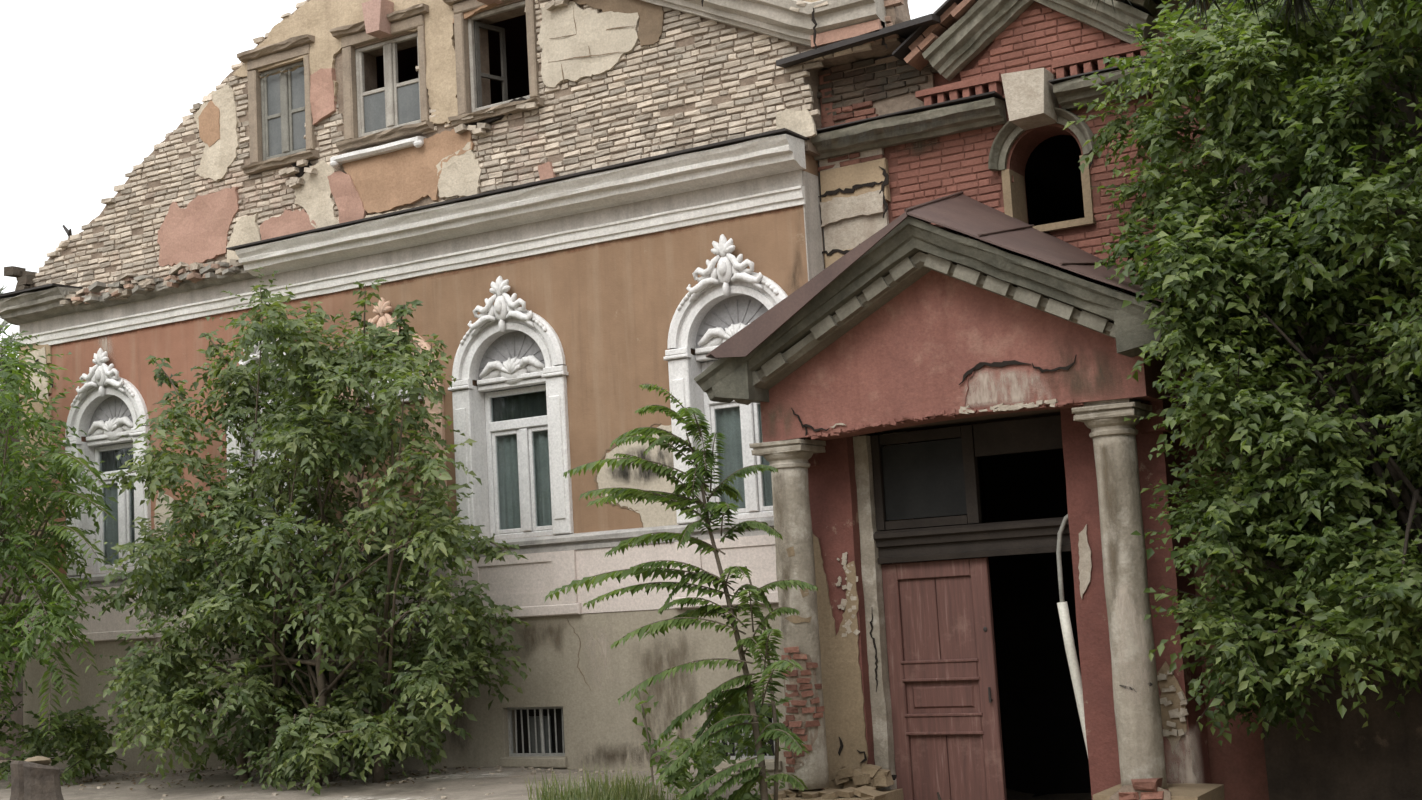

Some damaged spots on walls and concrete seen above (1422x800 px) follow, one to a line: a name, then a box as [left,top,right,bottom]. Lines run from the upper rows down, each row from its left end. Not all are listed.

flaking render [4,0,939,292]
peeling [594,423,690,528]
crack [791,408,845,440]
crack [959,355,1077,414]
peeling [835,552,860,637]
flaking render [781,646,825,772]
flaking render [1109,586,1196,800]